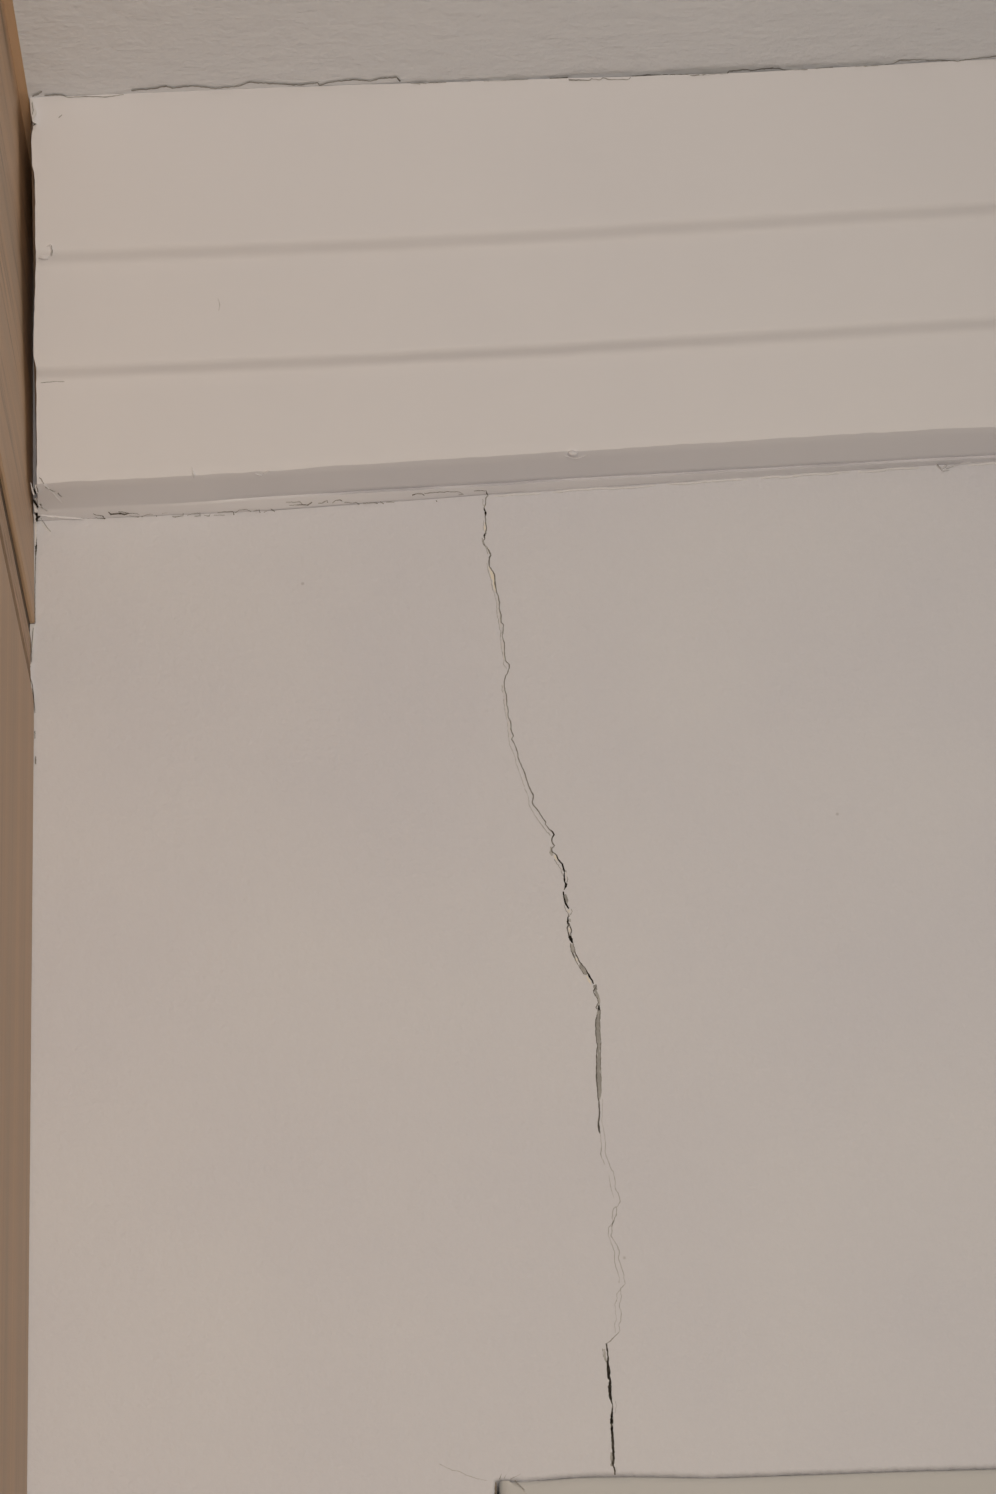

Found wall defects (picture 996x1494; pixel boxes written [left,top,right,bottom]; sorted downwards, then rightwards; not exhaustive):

crack [32,477,626,1475]